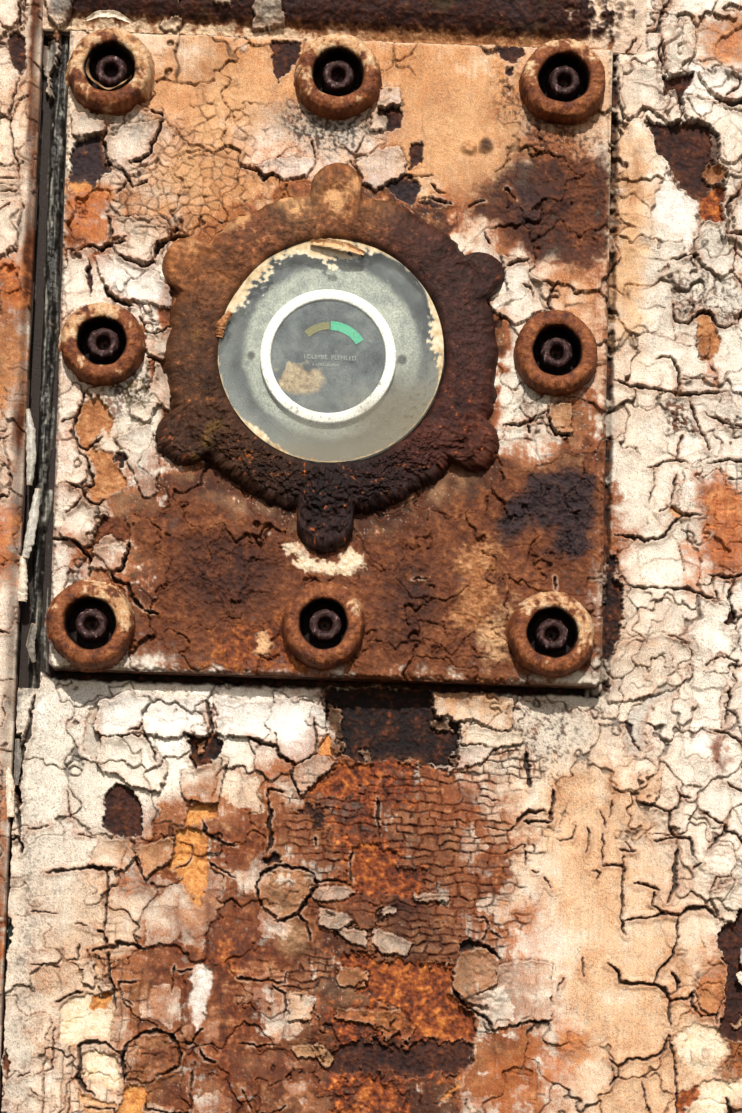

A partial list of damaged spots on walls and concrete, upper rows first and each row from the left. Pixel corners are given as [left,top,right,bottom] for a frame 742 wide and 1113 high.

crack [70,105,196,367]
peeling [359,83,462,216]
corrosion [382,62,611,284]
crack [605,64,742,550]
peeling [612,12,742,283]
corrosion [118,450,605,685]
crack [0,688,389,1113]
corrosion [114,790,376,1113]
peeling [54,680,528,921]
peeling [284,824,557,1113]
corrosion [393,1029,629,1113]
crack [445,627,742,1113]